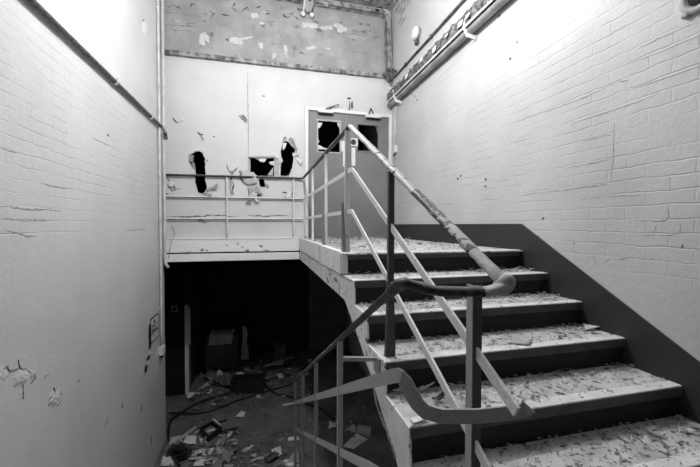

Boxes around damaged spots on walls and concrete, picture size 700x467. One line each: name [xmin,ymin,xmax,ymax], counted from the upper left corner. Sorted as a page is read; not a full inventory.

peeling [293,20,378,40]
peeling [225,36,330,61]
crack [518,65,700,200]
crack [634,209,681,236]
spalling [0,360,49,402]